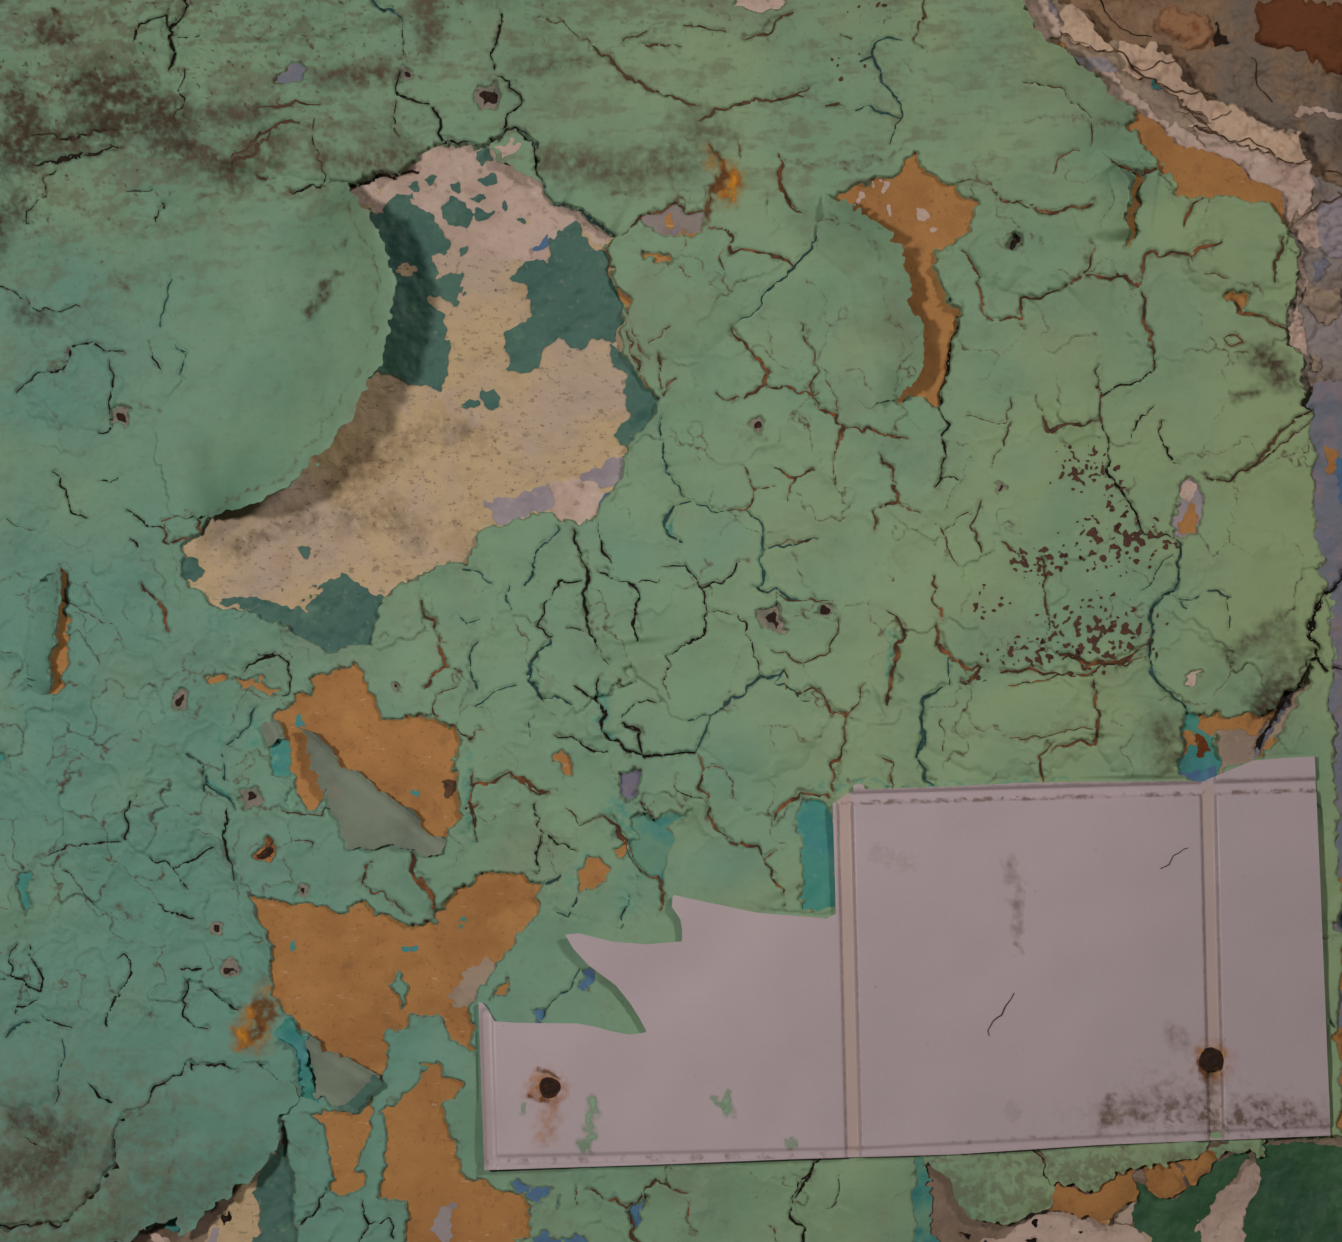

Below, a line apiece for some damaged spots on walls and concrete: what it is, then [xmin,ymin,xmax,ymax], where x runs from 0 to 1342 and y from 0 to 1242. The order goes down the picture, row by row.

peeling [181,129,659,653]
crack [361,0,1314,929]
flaking render [1023,0,1342,891]
crack [47,652,330,919]
peeling [206,663,462,857]
crack [1255,577,1342,751]
crack [0,944,264,1230]
corrosion [232,987,275,1048]
peeling [248,872,588,1242]
corrosion [528,1069,561,1102]
peeling [911,1111,1342,1242]
corrosion [1197,1047,1225,1079]